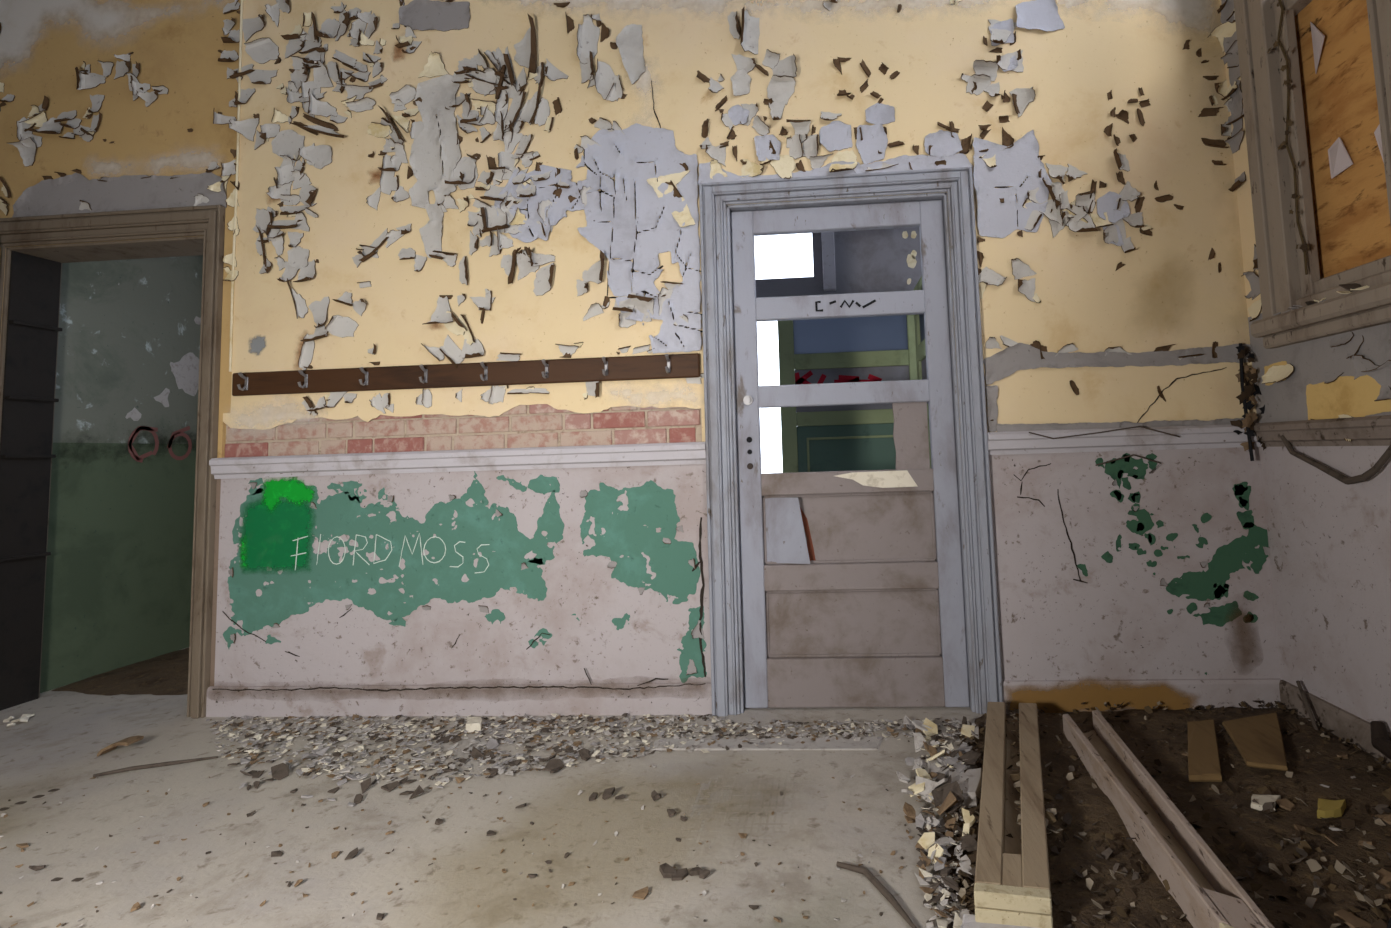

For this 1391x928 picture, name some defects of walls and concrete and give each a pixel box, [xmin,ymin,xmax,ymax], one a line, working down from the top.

peeling [1182,0,1244,165]
peeling [0,0,1184,370]
peeling [1228,171,1246,192]
peeling [1241,244,1262,322]
peeling [126,407,142,421]
peeling [154,352,199,407]
peeling [983,335,1259,432]
peeling [1261,361,1294,386]
peeling [1306,331,1391,420]
peeling [223,471,707,683]
peeling [1095,453,1270,627]